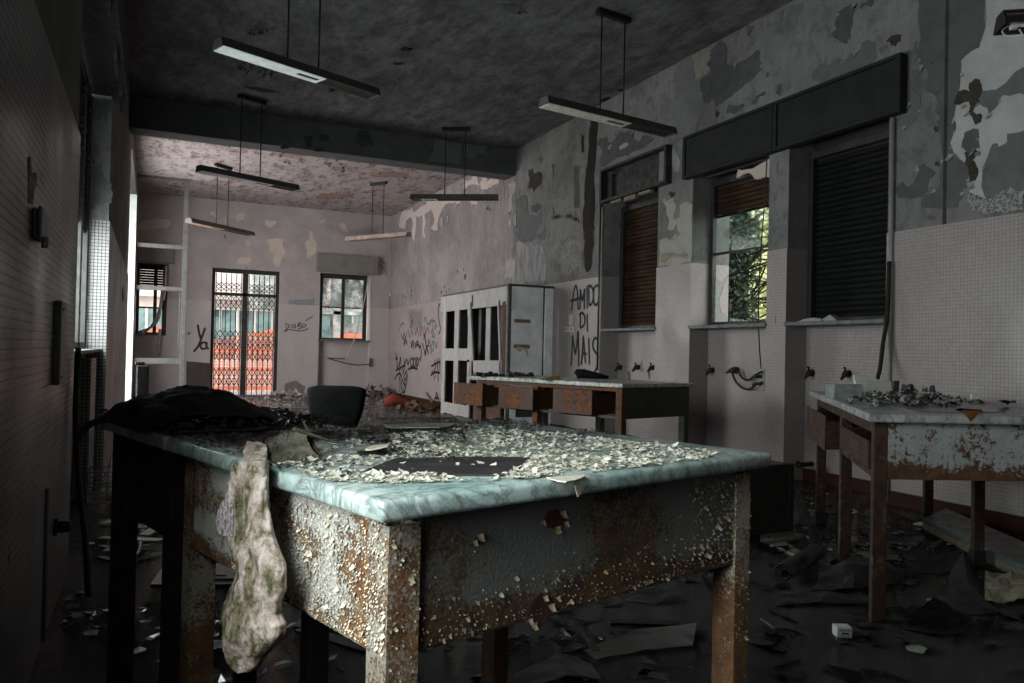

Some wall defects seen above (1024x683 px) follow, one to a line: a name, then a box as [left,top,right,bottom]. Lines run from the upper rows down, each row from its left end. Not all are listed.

peeling [671,40,782,173]
peeling [812,0,1024,214]
peeling [399,201,491,241]
peeling [462,156,547,285]
leakage [552,120,598,272]
peeling [659,191,692,267]